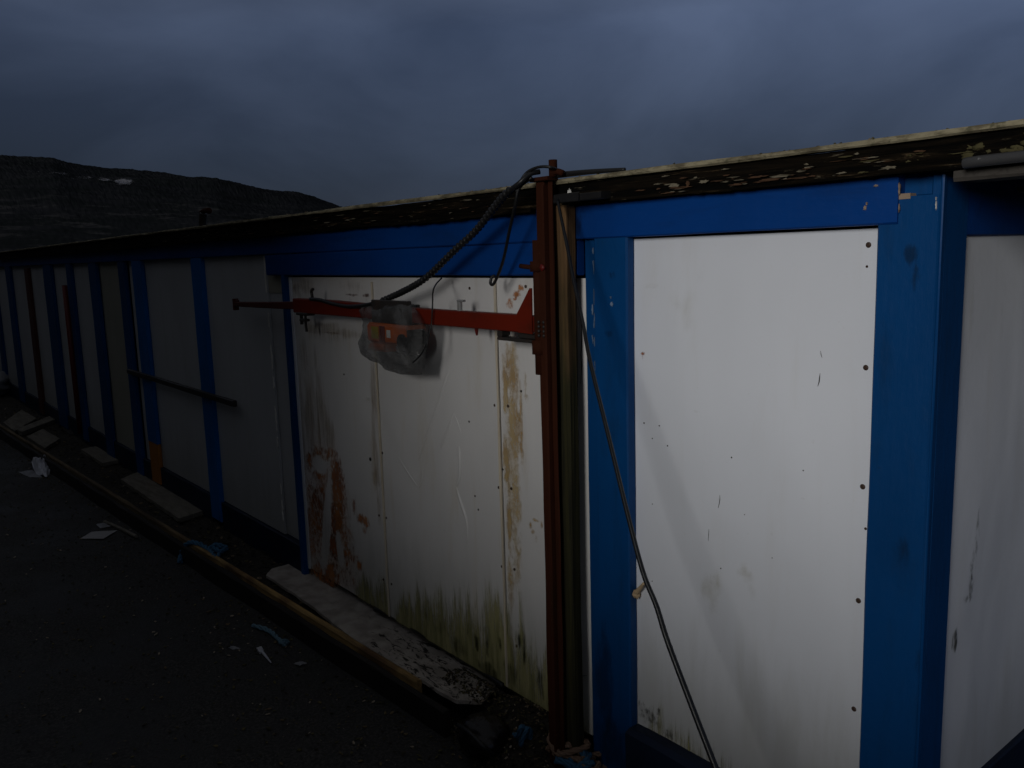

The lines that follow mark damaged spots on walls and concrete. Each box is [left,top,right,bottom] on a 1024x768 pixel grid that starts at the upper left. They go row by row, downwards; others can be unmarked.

peeling [636,163,815,194]
peeling [831,150,926,212]
rust [306,448,368,587]